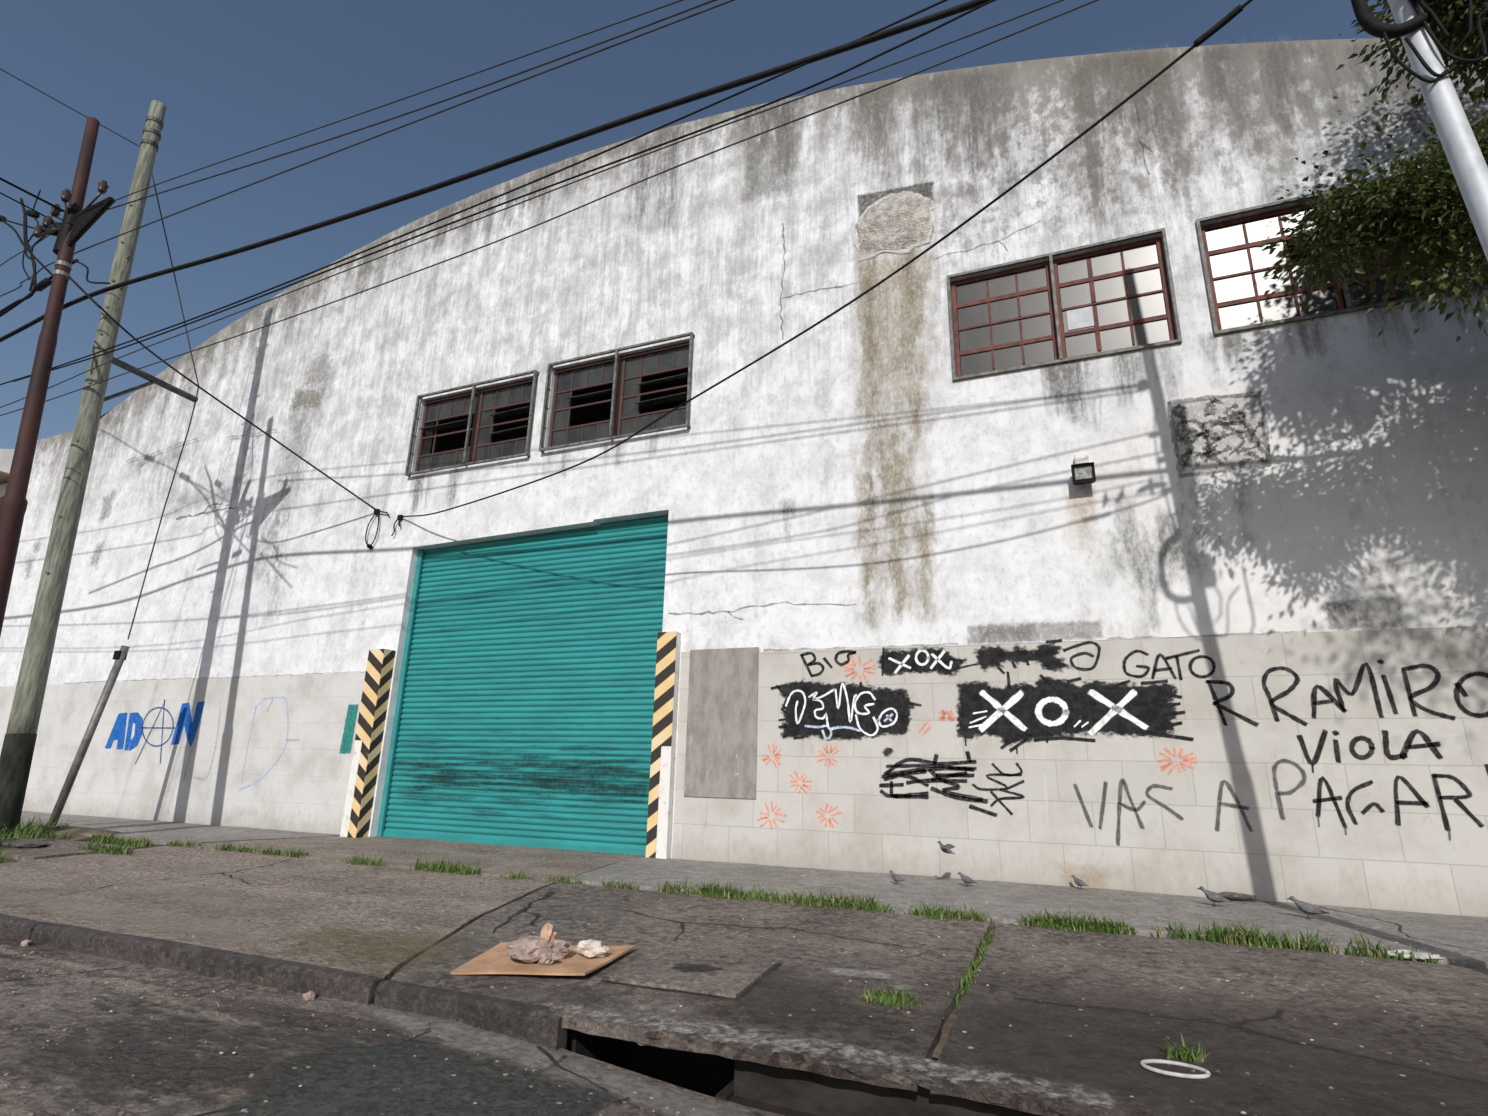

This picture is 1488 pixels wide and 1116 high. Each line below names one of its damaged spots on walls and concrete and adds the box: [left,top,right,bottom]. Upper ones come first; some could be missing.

flaking render [853,182,934,261]
crack [780,223,855,339]
damp [862,248,926,437]
crack [668,602,856,620]
crack [764,643,958,651]
crack [1107,631,1294,639]